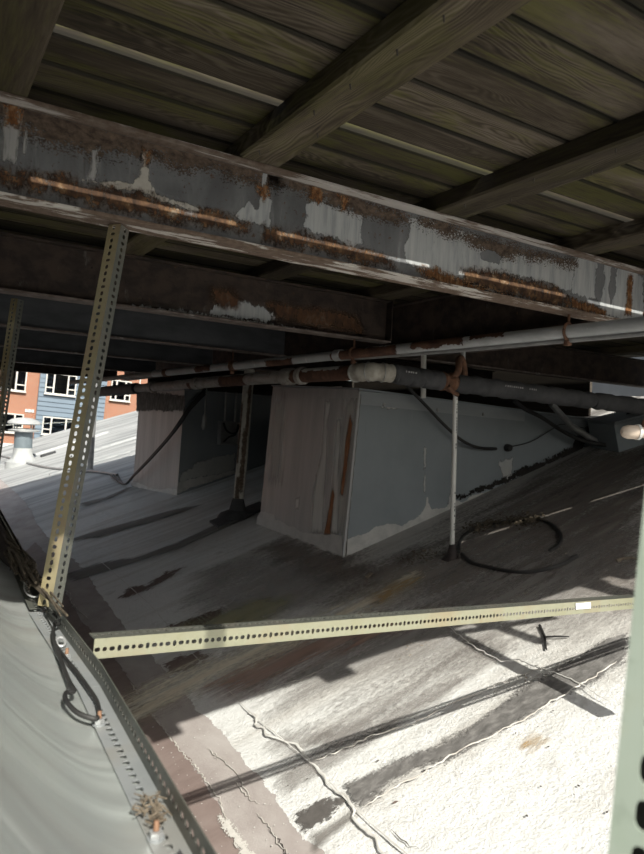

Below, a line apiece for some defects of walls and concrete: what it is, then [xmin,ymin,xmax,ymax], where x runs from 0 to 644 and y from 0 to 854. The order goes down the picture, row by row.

rust [0,108,607,316]
peeling [303,201,363,248]
peeling [210,301,276,324]
rust [266,301,364,336]
rust [410,332,504,350]
peeling [404,218,644,319]
rust [625,274,634,317]
rust [324,415,352,535]
peeling [256,492,486,558]
peeling [0,479,325,854]